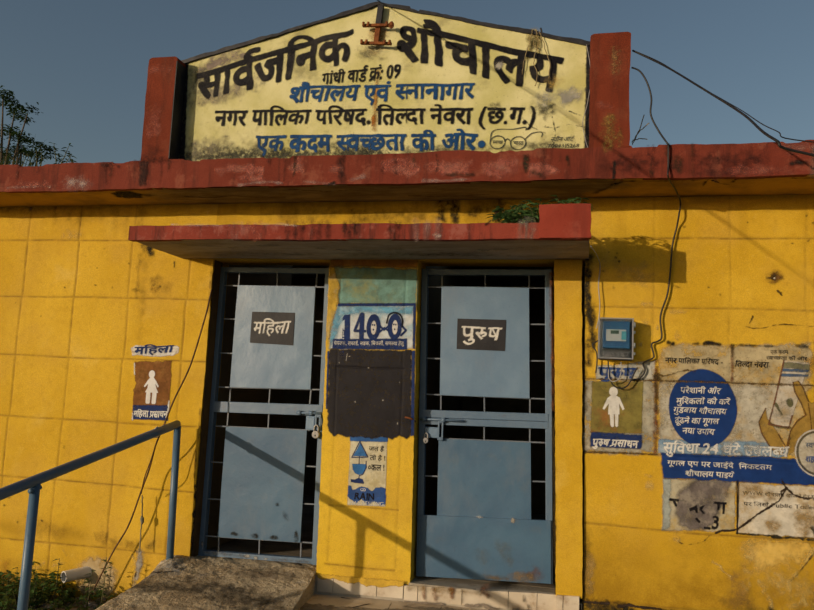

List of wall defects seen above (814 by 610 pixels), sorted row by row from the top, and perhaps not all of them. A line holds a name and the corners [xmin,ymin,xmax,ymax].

leakage [111,161,152,198]
leakage [185,141,383,177]
leakage [582,254,596,396]
crack [679,481,814,582]